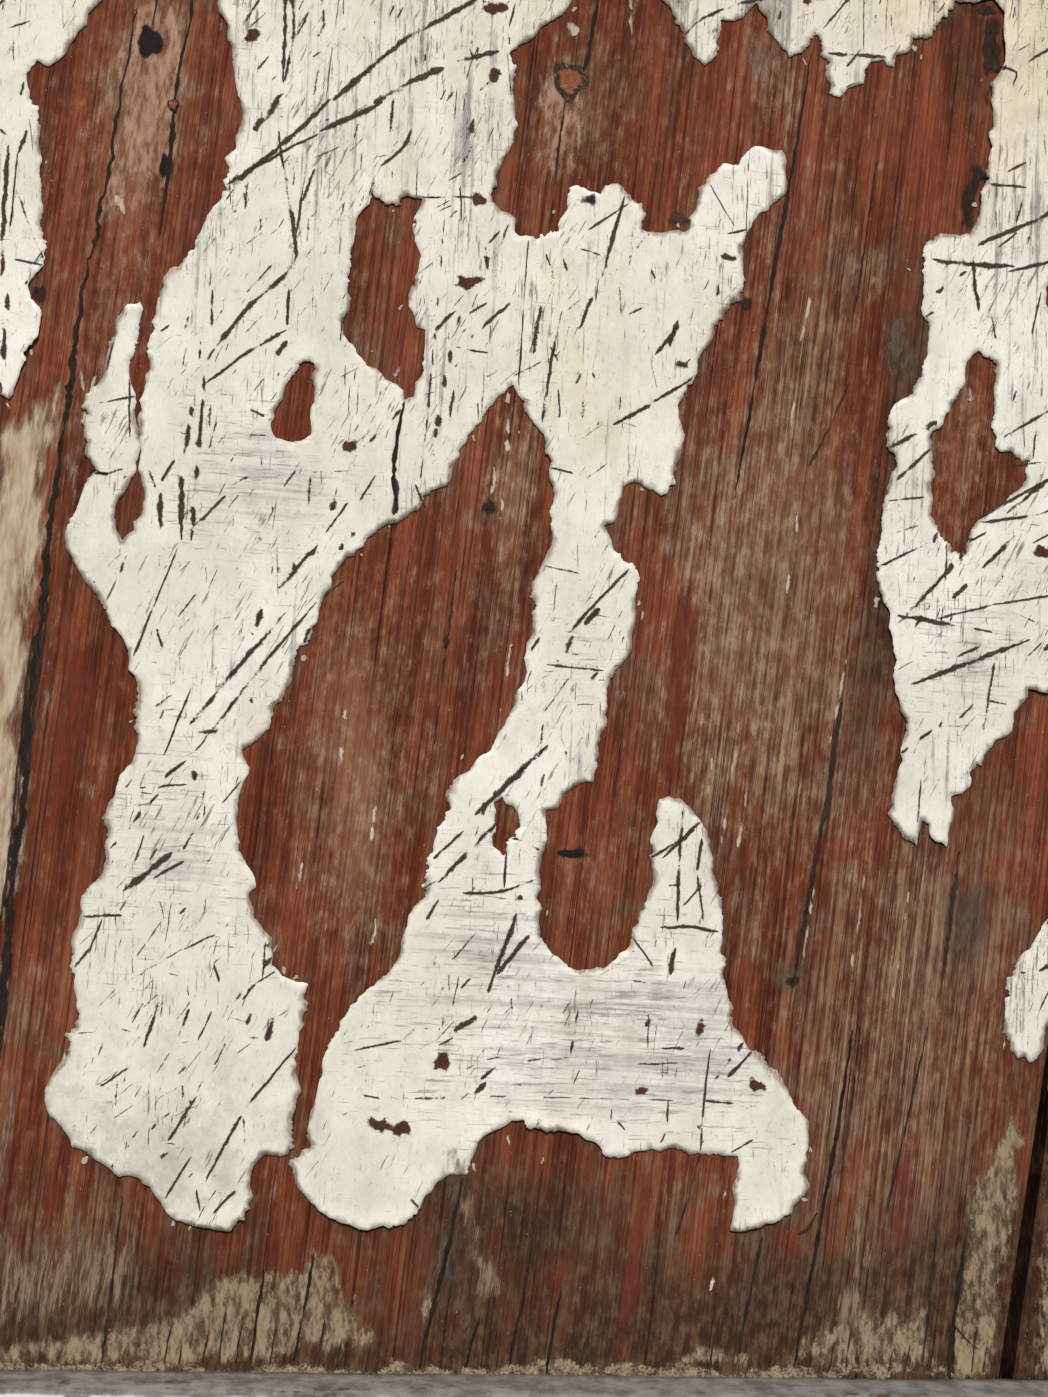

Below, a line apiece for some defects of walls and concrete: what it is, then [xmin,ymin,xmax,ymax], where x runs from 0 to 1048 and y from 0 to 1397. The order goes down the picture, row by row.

peeling [482,1,509,14]
peeling [489,67,502,82]
peeling [343,193,425,400]
peeling [455,275,485,290]
peeling [471,192,487,206]
peeling [271,362,315,442]
crack [0,0,193,1055]
peeling [0,0,243,1160]
peeling [491,0,1048,1379]
peeling [0,385,934,1379]
crack [101,1196,123,1365]